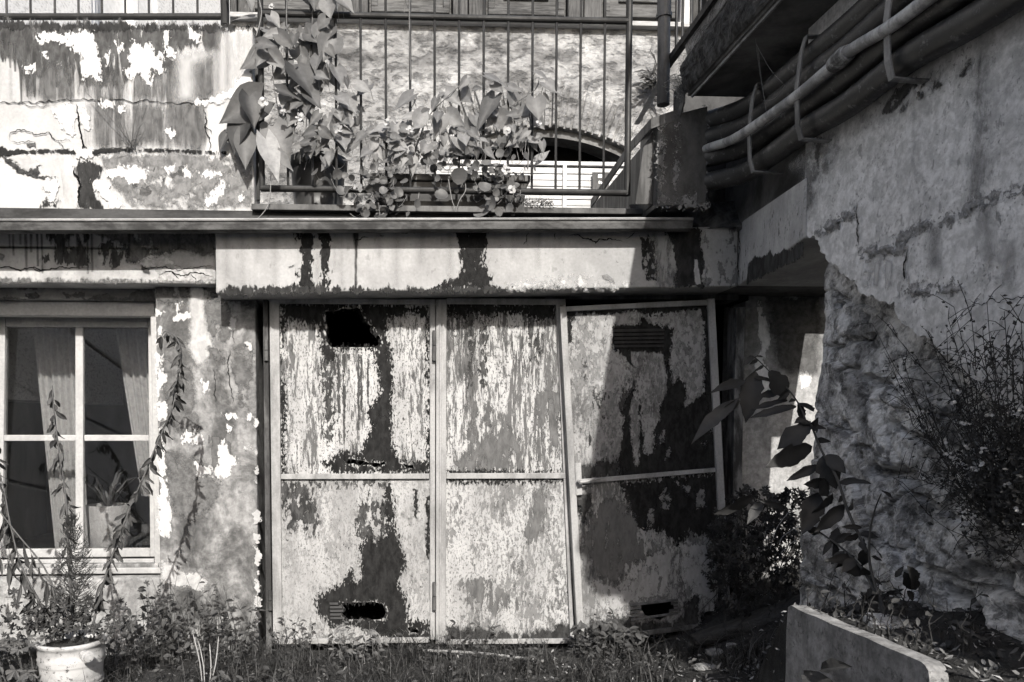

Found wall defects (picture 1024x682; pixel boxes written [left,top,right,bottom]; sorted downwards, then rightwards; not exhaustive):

peeling [22,28,177,87]
peeling [10,142,41,172]
peeling [51,98,127,163]
crack [0,98,227,207]
peeling [90,163,245,209]
water stain [9,233,215,269]
water stain [154,287,190,308]
water stain [203,233,632,408]
peeling [573,308,706,400]
peeling [181,412,259,484]
peeling [160,560,208,592]
peeling [252,509,262,625]